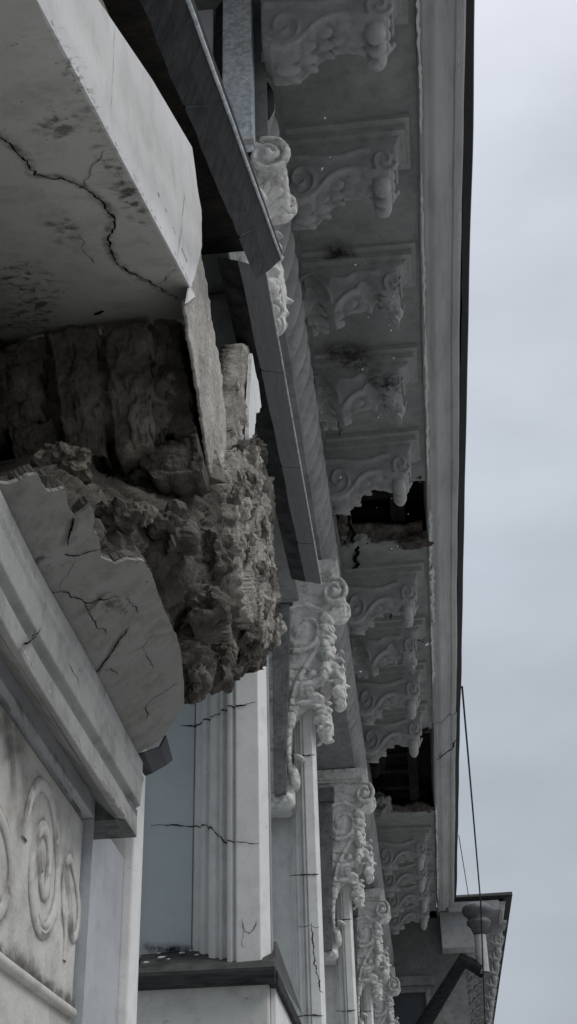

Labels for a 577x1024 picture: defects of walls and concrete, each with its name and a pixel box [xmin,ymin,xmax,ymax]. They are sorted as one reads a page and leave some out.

spalling [0,248,287,705]